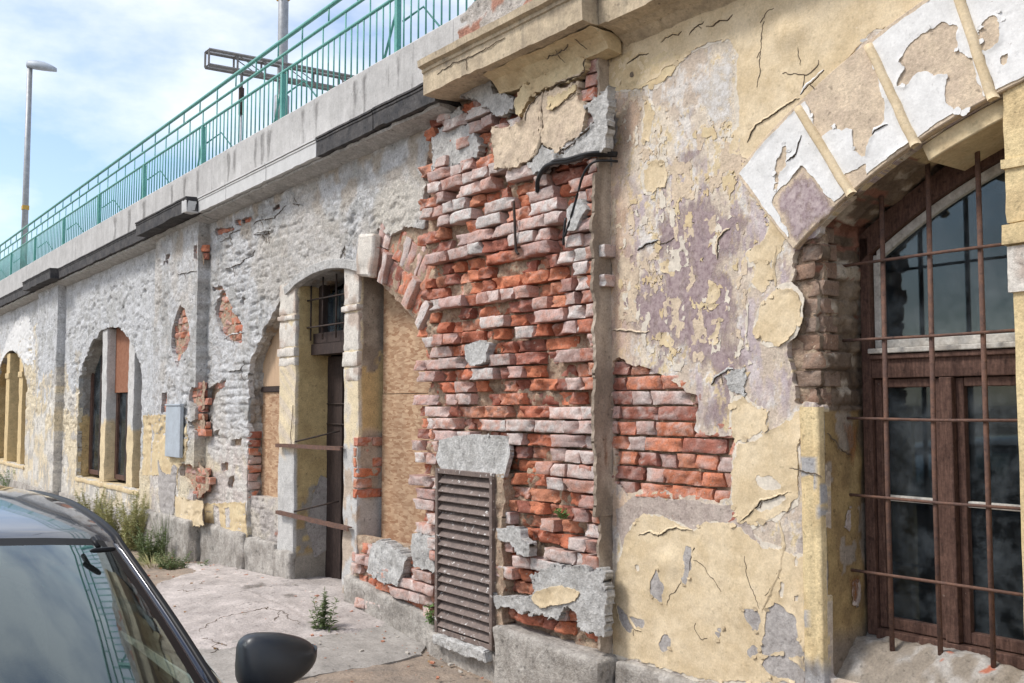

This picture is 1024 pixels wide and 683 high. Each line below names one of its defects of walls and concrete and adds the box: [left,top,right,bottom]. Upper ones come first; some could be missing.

crack [437,38,504,75]
crack [747,8,824,142]
crack [220,189,303,277]
spalling [174,308,190,361]
spalling [214,287,243,343]
flaking render [351,0,1024,683]
peeling [142,381,262,537]
crack [740,468,822,613]